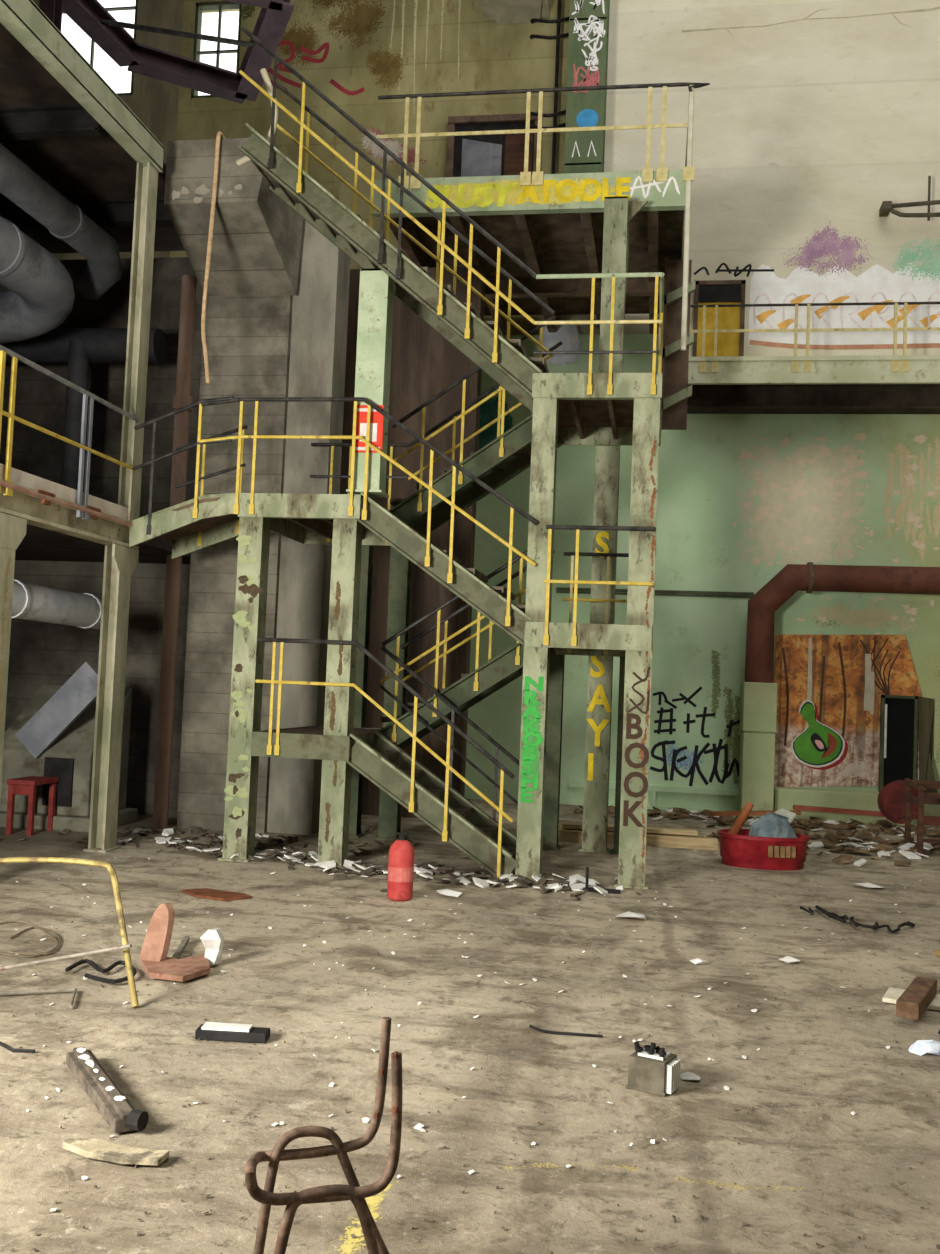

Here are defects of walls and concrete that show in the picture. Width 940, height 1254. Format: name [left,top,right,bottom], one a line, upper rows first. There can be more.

damp [277,0,461,107]
peeling [729,431,940,573]